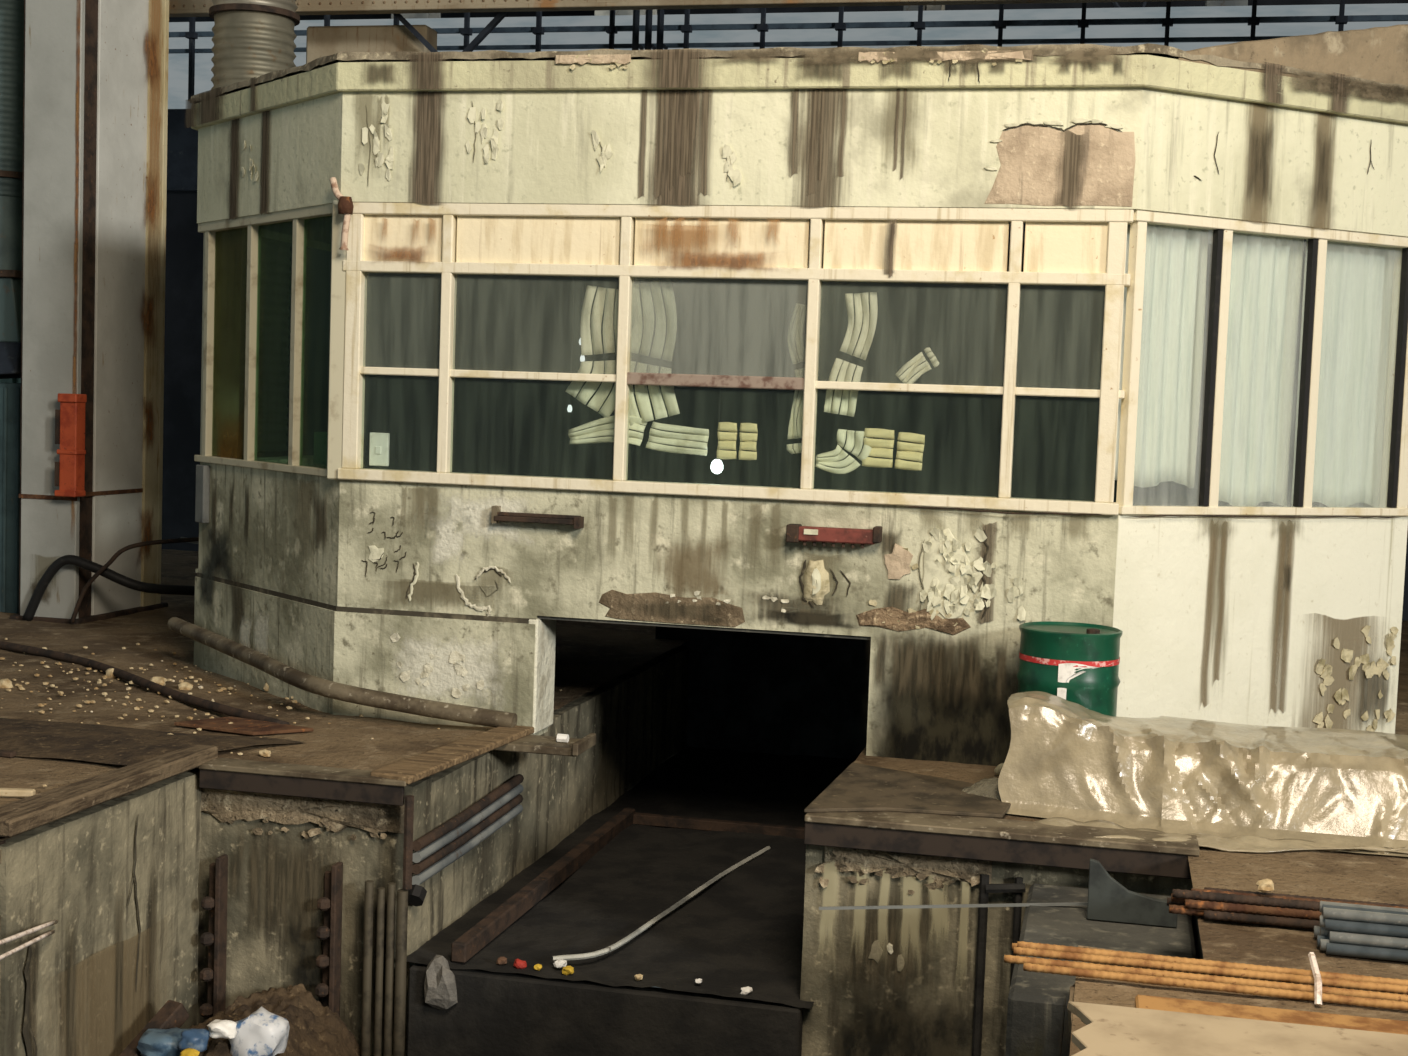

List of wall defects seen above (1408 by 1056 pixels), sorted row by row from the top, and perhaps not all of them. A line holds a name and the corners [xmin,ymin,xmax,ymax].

peeling [359,101,394,181]
water stain [368,64,393,82]
water stain [409,52,444,205]
water stain [638,49,711,206]
water stain [789,59,847,208]
flaking render [984,118,1135,209]
corrosion [658,218,765,269]
corrosion [768,220,778,238]
water stain [201,490,268,655]
spalling [599,590,745,627]
flaking render [856,522,1026,635]
spalling [0,771,405,1056]